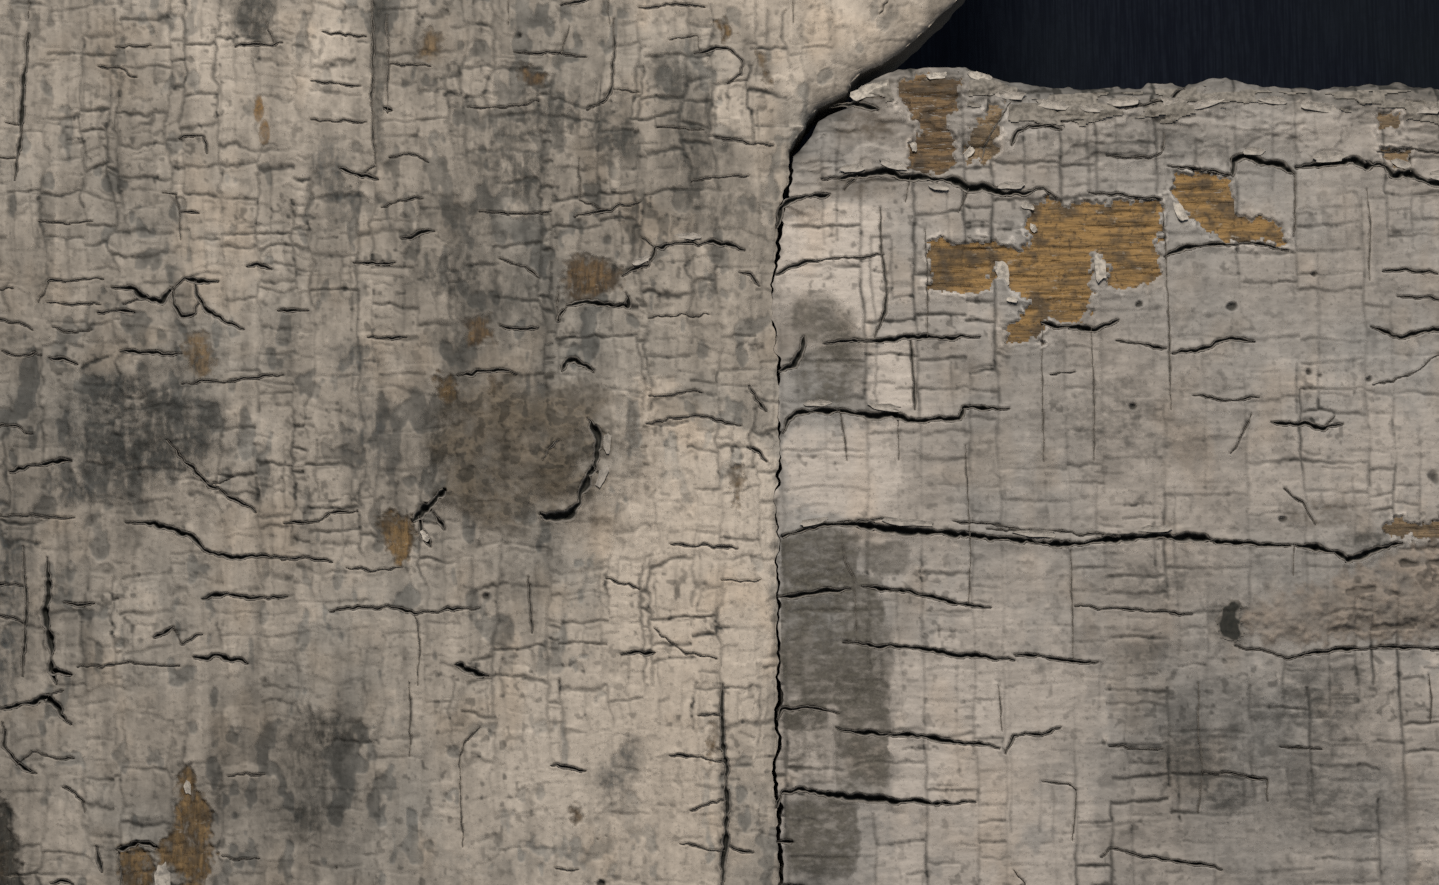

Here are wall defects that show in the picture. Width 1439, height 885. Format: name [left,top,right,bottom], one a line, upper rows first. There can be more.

crack [1,0,30,180]
crack [310,0,434,265]
crack [508,0,744,110]
peeling [850,70,1439,175]
crack [0,262,283,384]
peeling [926,172,1287,344]
crack [471,88,1439,753]
peeling [1382,517,1439,541]
peeling [120,767,212,885]
crack [0,439,446,812]
crack [621,628,976,885]
leakage [780,531,890,874]